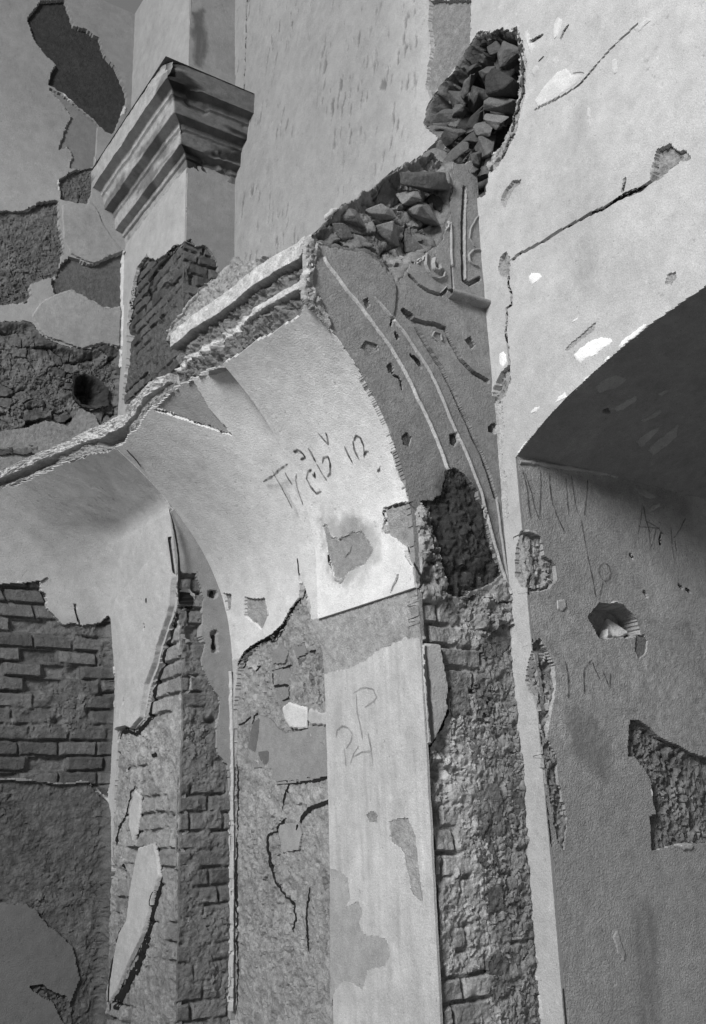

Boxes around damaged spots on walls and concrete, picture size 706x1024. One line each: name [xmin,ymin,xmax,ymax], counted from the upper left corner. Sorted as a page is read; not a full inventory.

flaking render [429,2,488,97]
crack [540,41,619,107]
flaking render [0,1,332,491]
crack [505,185,648,348]
flaking render [518,530,553,595]
flaking render [0,469,544,1024]
crack [266,776,328,952]
flaking render [627,721,706,851]